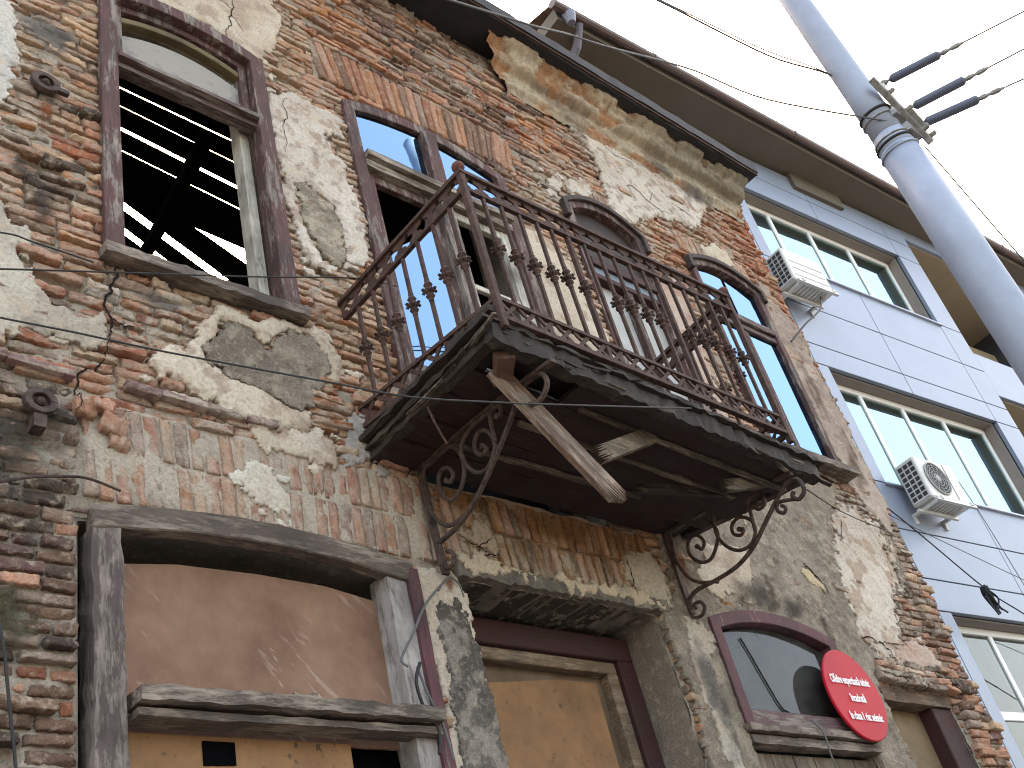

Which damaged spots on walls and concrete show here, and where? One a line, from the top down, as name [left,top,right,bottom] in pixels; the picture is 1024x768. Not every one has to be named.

flaking render [537,124,707,231]
flaking render [699,242,734,267]
crack [73,267,140,411]
flaking render [138,304,392,528]
crack [459,535,499,556]
flaking render [553,550,674,609]
flaking render [828,503,953,672]
spalling [952,679,1011,768]